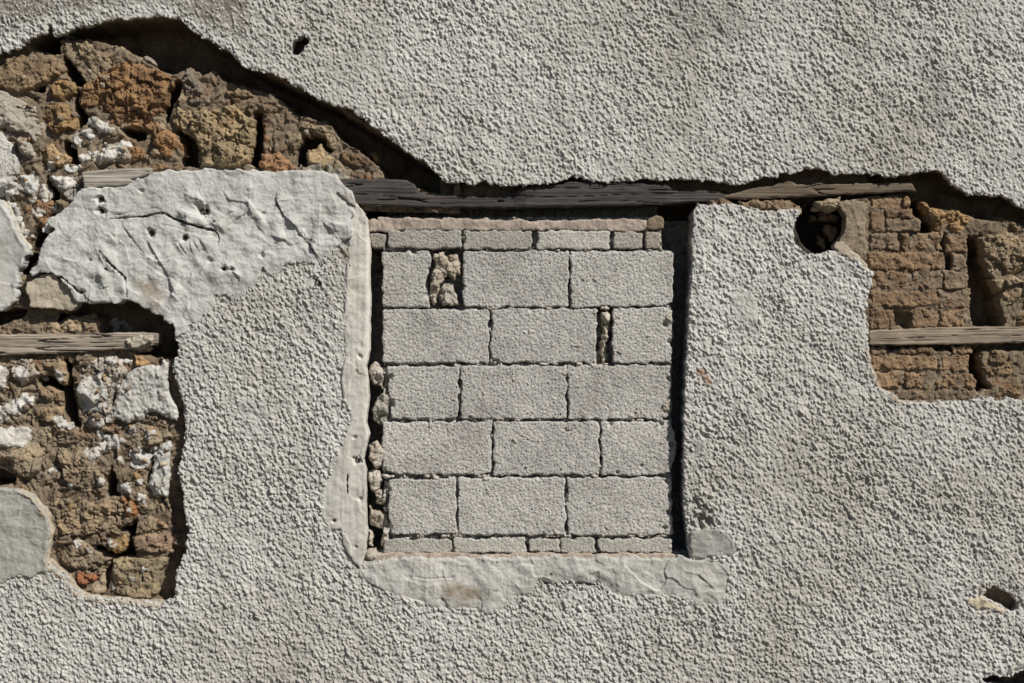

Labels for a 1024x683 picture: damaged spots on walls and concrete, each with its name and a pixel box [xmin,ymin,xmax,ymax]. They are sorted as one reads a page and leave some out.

crack [117,207,220,245]
crack [275,193,322,269]
crack [103,258,128,297]
spalling [0,17,602,607]
spalling [612,169,1024,404]